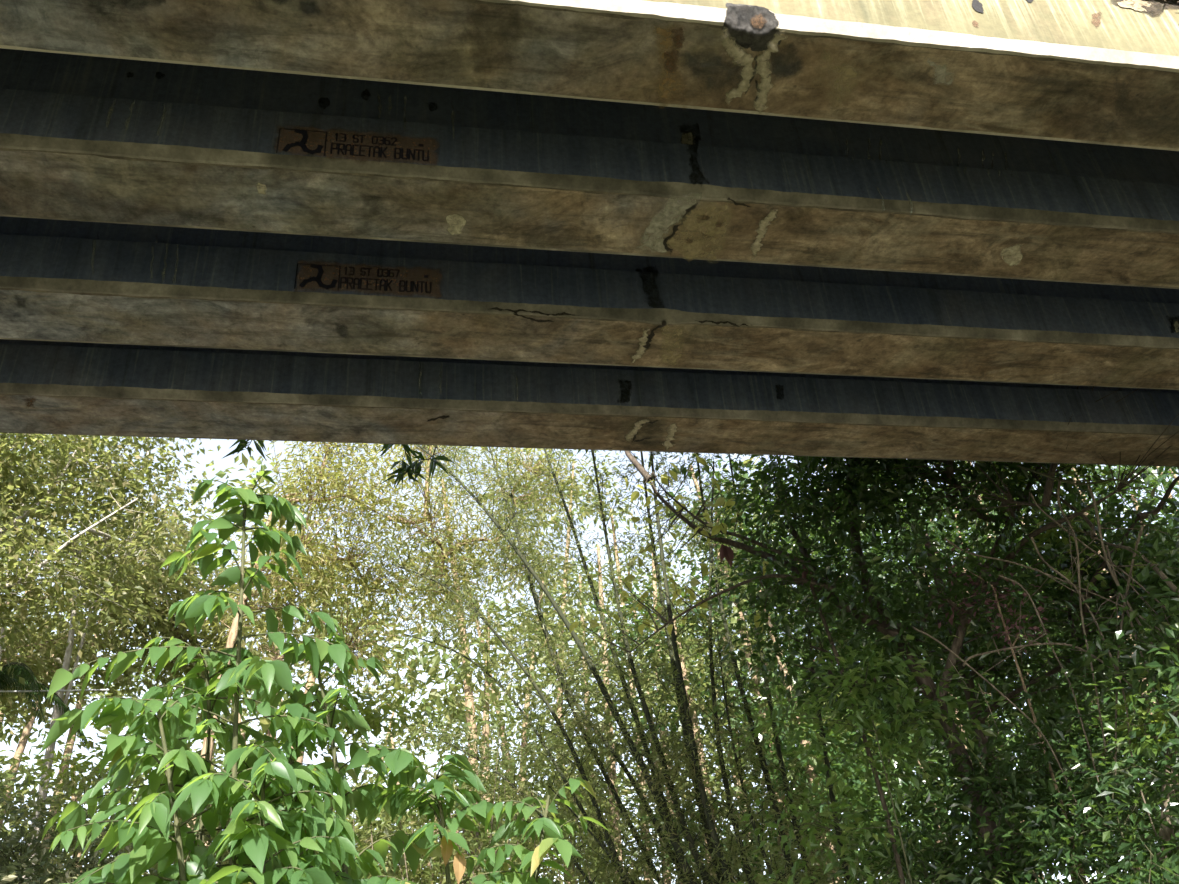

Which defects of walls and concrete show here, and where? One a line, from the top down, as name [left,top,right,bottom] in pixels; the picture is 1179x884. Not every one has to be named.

damp [770,45,801,77]
crack [663,203,704,252]
crack [492,307,573,322]
crack [645,321,667,350]
crack [695,319,748,327]